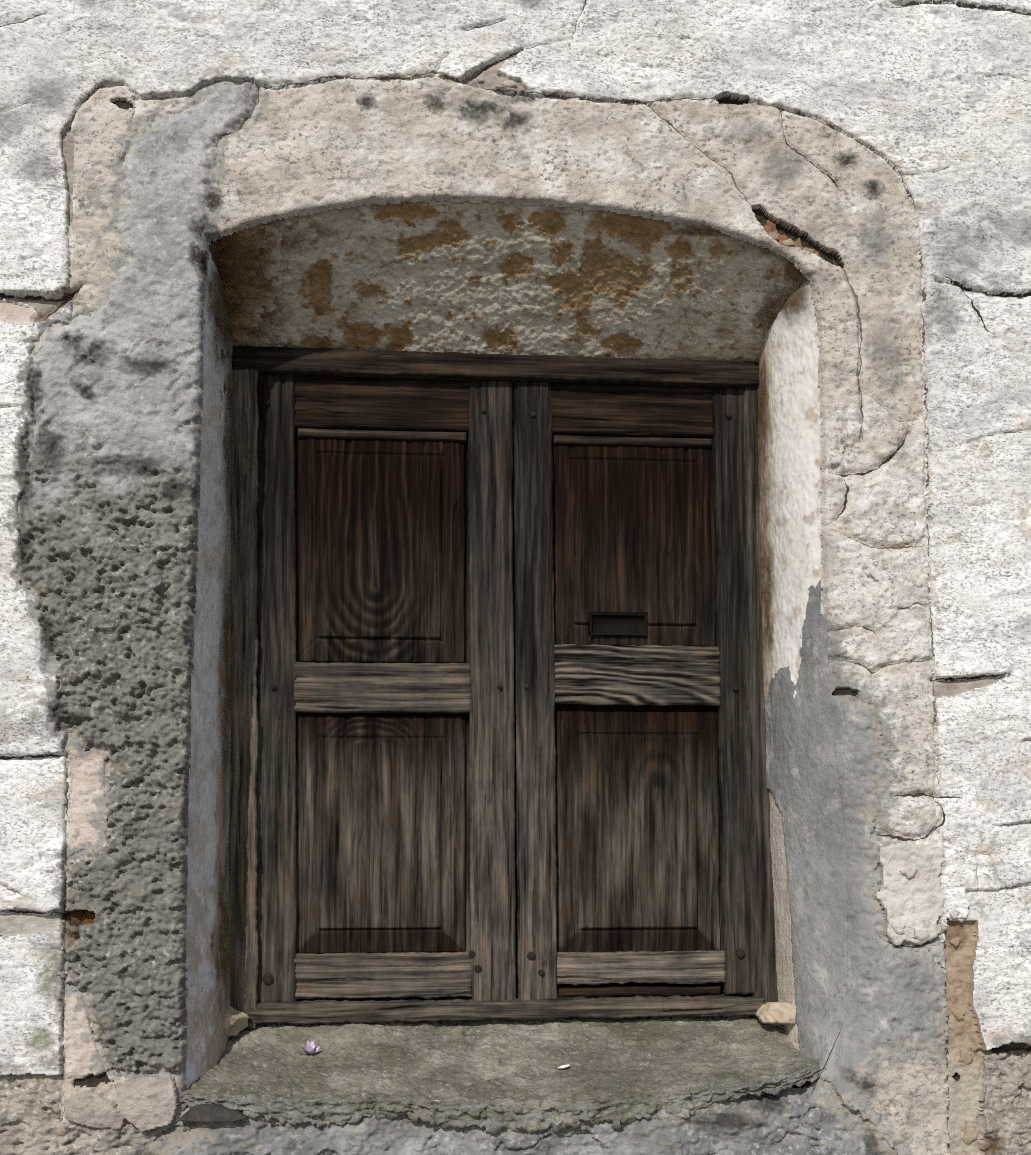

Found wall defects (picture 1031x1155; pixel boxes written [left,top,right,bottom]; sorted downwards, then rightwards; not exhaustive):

crack [0,13,46,27]
crack [895,0,1031,16]
flaking render [112,99,134,110]
crack [67,0,752,206]
peeling [498,211,694,336]
flaking render [752,206,845,268]
crack [749,102,1031,353]
flaking render [832,688,860,696]
flaking render [69,759,108,856]
flaking render [769,790,800,1051]
flaking render [64,994,114,1087]
flaking render [944,919,1031,1155]